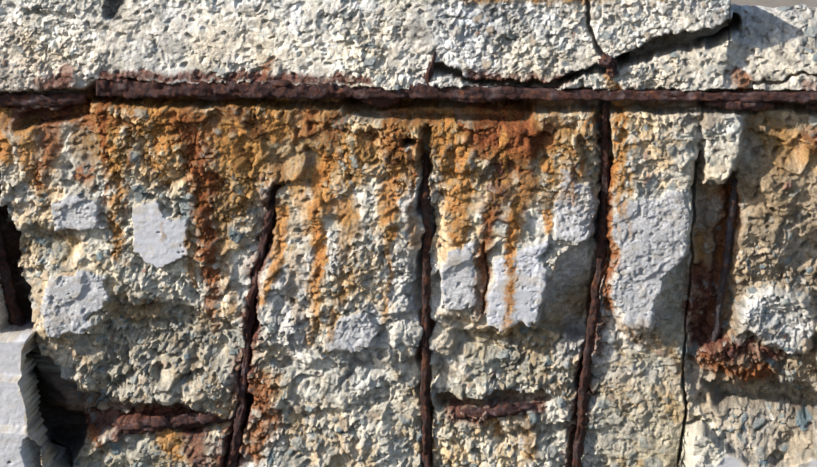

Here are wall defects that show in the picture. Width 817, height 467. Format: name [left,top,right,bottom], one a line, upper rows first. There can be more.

rust [35,74,72,90]
rust [99,57,371,87]
spalling [0,0,817,97]
rust [460,69,571,84]
crack [460,0,743,91]
rust [732,67,751,91]
crack [752,71,817,87]
rust [772,127,817,162]
rust [593,100,635,354]
rust [0,88,597,467]
spalling [0,95,817,467]
rust [682,184,784,382]